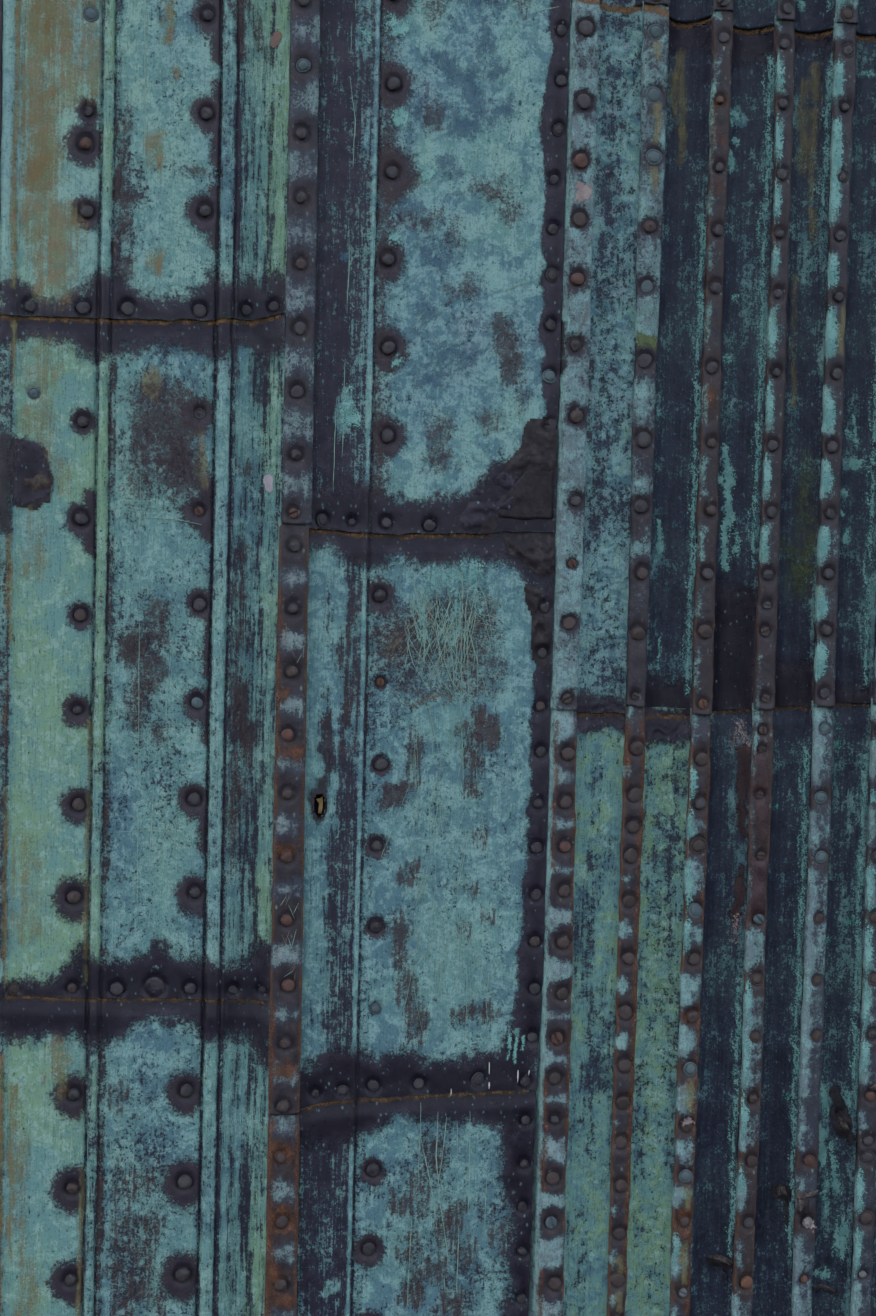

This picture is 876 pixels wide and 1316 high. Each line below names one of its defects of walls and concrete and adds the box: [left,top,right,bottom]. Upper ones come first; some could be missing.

corrosion [550,721,576,962]
corrosion [539,1029,572,1191]
corrosion [578,712,689,1279]